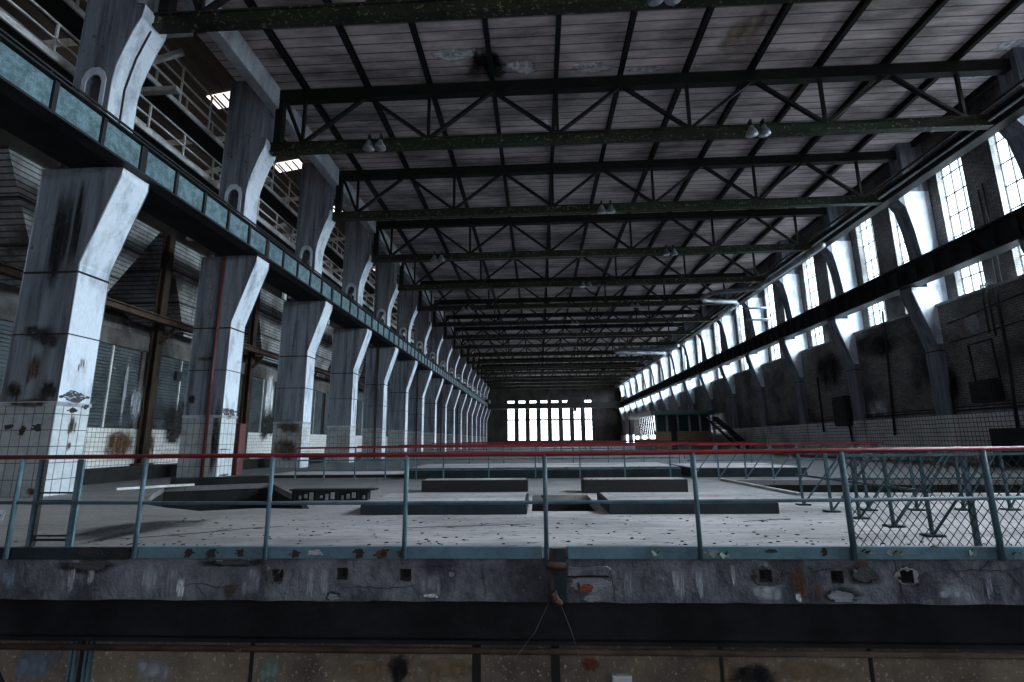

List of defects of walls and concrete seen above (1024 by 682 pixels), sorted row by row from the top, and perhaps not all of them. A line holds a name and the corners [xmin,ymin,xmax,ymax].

water stain [433,49,535,74]
water stain [49,187,84,279]
corrosion [7,358,55,407]
spalling [59,390,90,413]
corrosion [105,431,132,454]
spalling [825,567,878,602]
spalling [893,567,929,587]